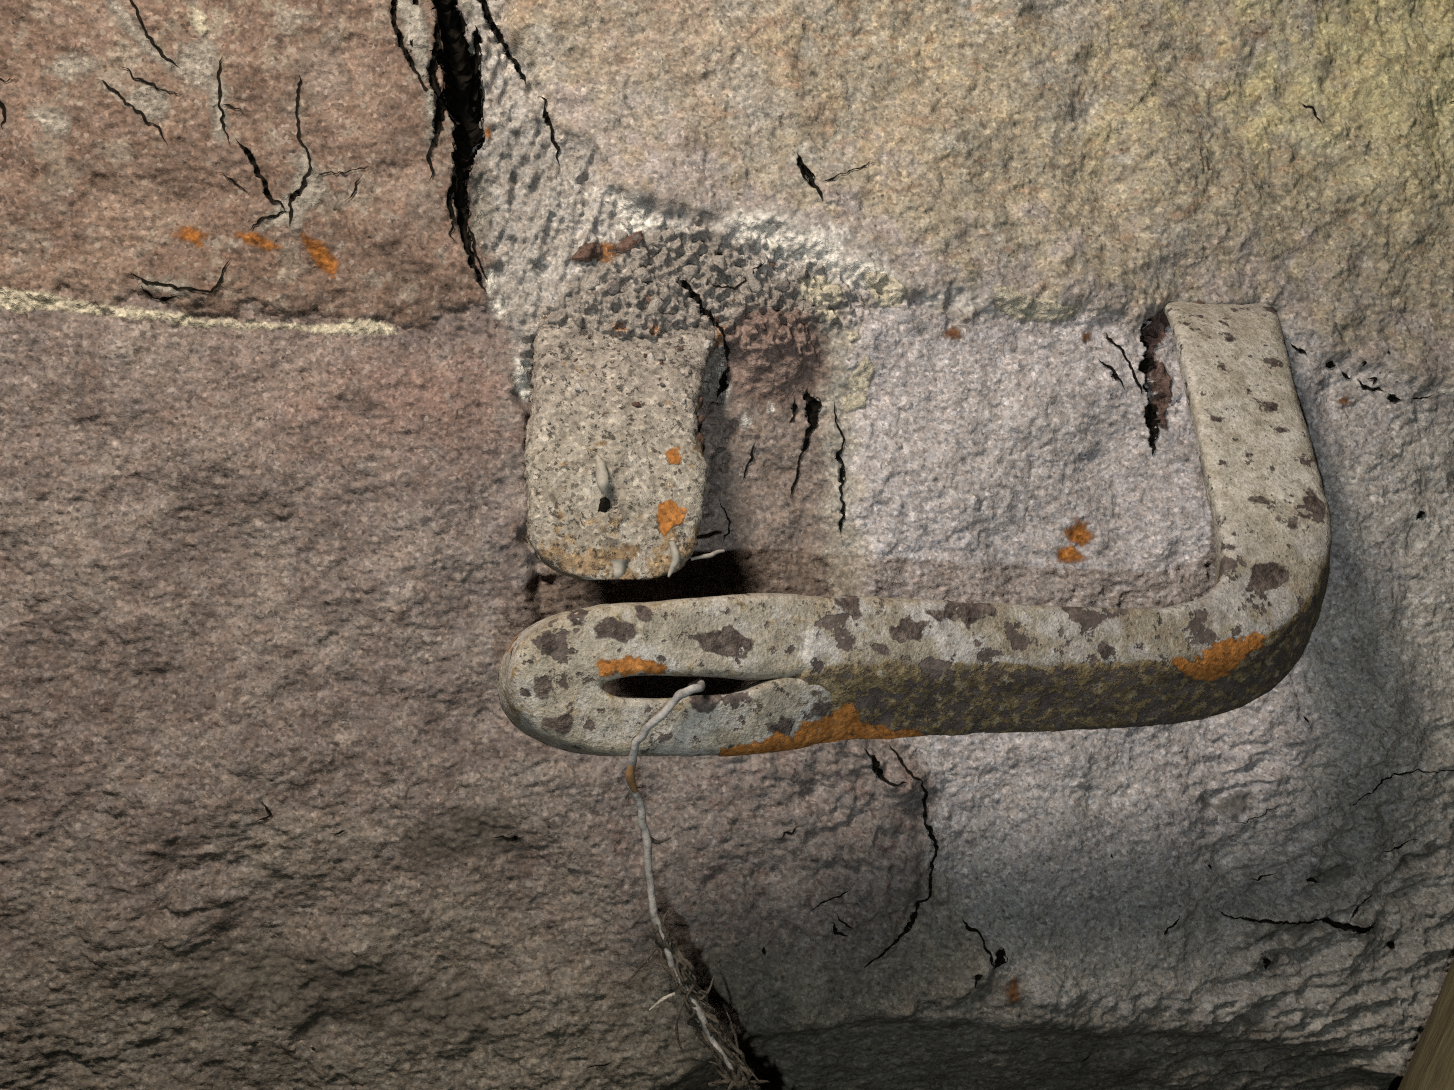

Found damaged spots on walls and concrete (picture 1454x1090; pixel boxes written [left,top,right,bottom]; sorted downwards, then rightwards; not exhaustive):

crack [97,0,180,146]
crack [130,58,373,302]
crack [390,0,560,294]
crack [1099,316,1161,458]
rust [655,500,687,535]
crack [789,388,846,535]
rust [1057,520,1092,563]
rust [533,675,552,699]
rust [542,714,573,735]
rust [567,605,652,643]
rust [765,701,832,737]
crack [863,744,939,968]